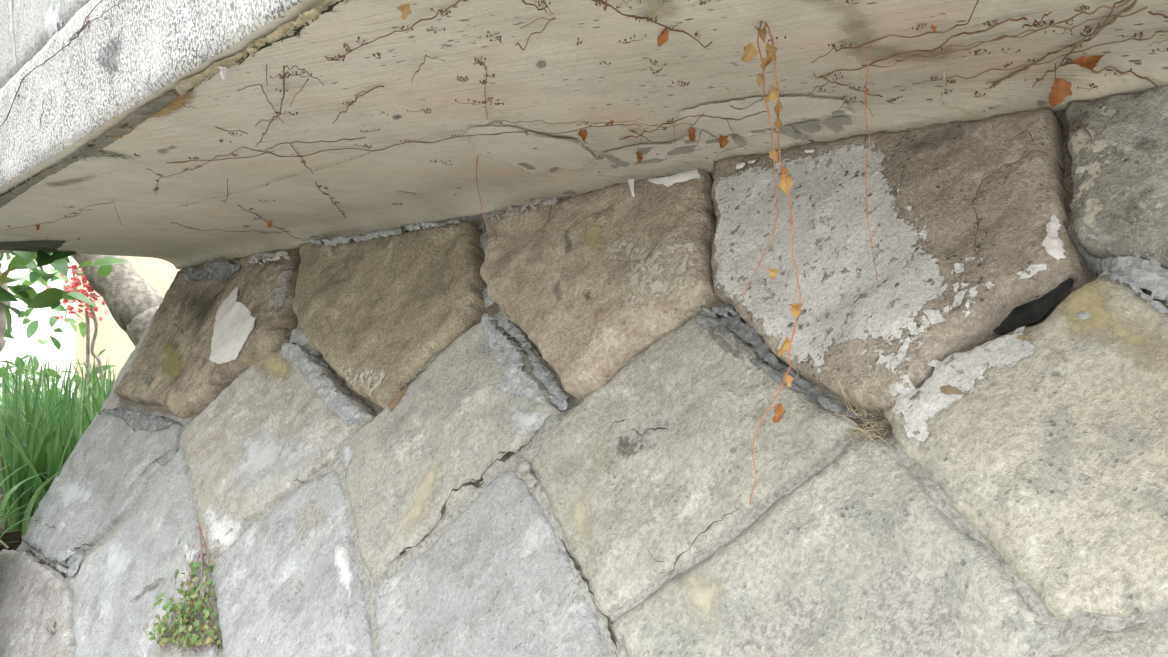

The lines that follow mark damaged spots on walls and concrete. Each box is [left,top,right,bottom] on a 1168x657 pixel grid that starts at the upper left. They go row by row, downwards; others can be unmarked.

spalling [0,0,350,208]
peeling [466,95,1074,442]
crack [388,408,550,563]
crack [648,508,738,574]